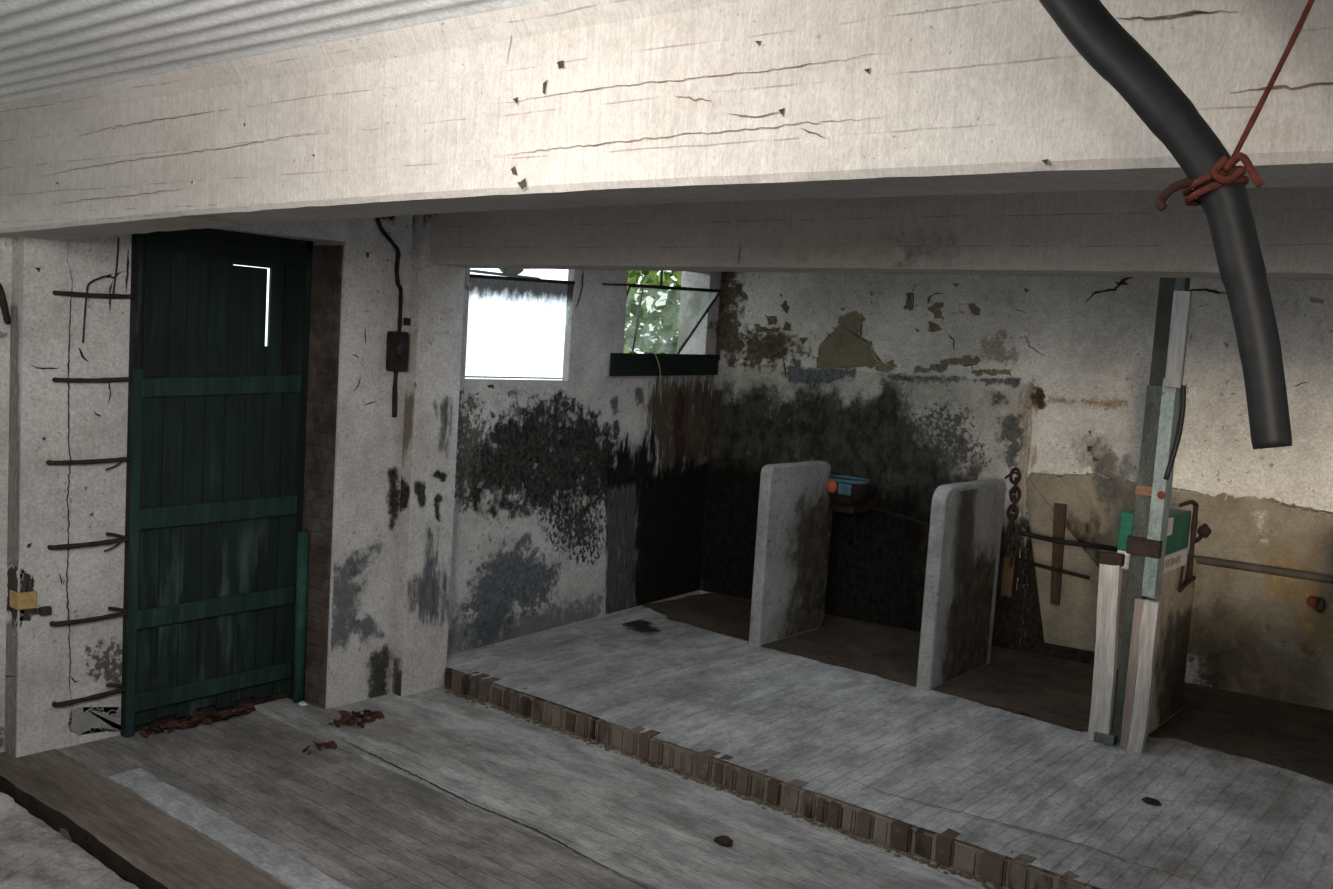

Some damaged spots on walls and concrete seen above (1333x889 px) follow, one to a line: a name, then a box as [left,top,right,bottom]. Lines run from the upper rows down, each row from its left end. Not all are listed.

crack [1085,277,1134,303]
water stain [787,365,856,384]
peeling [746,291,1013,377]
water stain [386,389,694,656]
water stain [331,544,402,698]